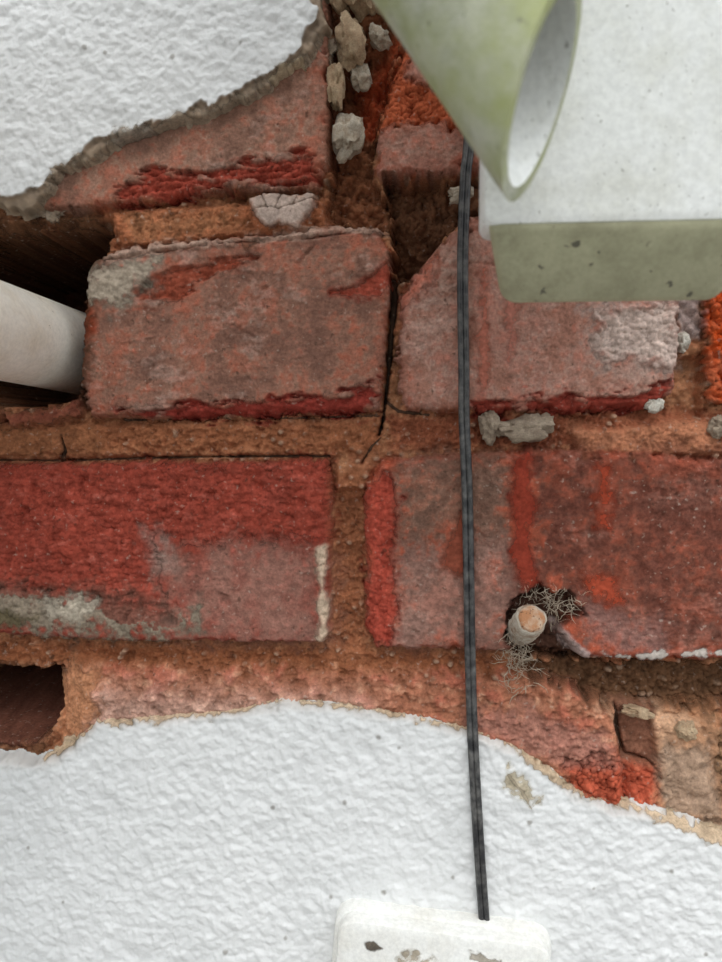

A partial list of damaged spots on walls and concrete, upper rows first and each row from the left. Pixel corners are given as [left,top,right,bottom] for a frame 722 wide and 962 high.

spalling [378,54,459,133]
spalling [0,37,337,313]
spalling [307,176,458,316]
crack [123,416,186,424]
crack [264,279,430,463]
spalling [475,382,674,418]
damp [589,300,680,374]
spalling [697,292,722,405]
spalling [0,456,335,608]
damp [0,592,206,642]
spalling [0,659,278,761]
spalling [504,741,722,846]